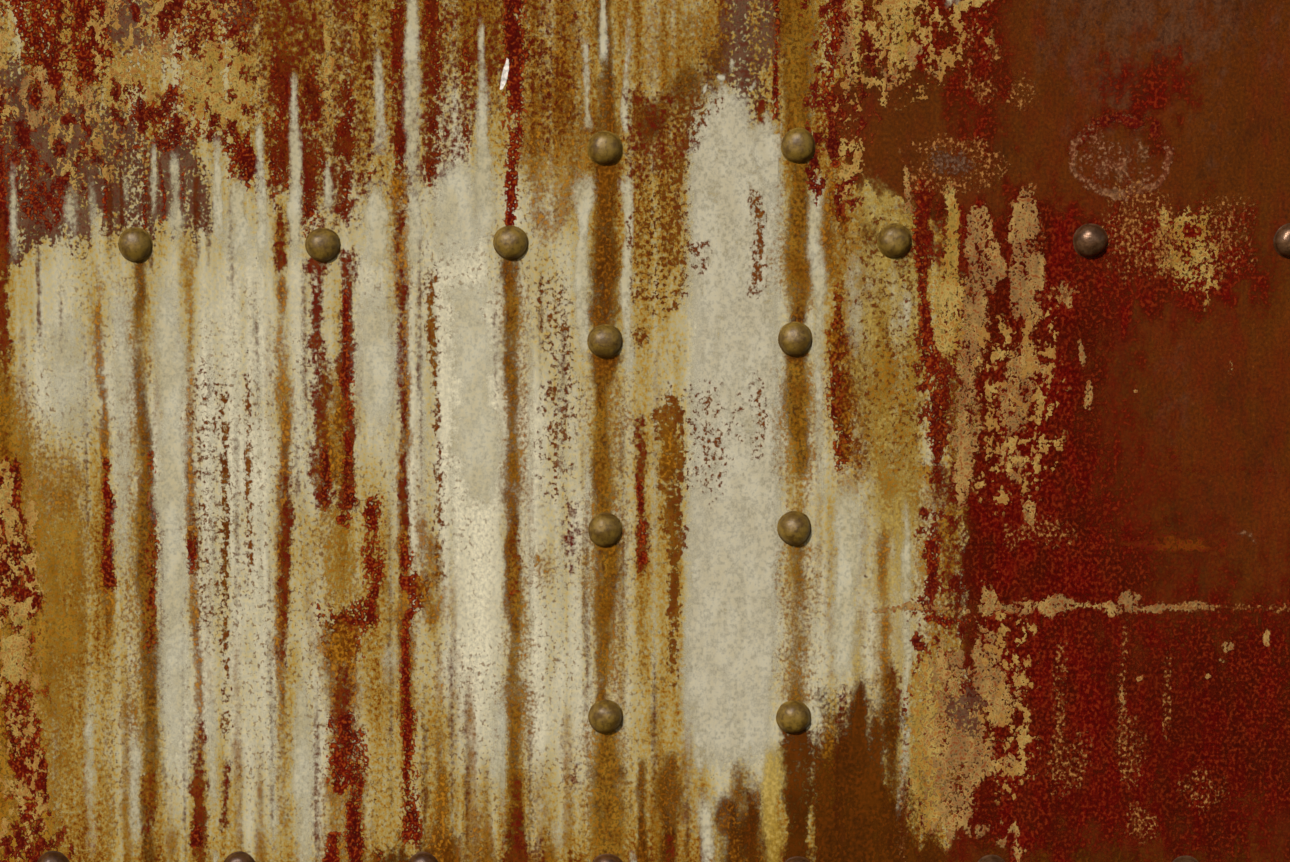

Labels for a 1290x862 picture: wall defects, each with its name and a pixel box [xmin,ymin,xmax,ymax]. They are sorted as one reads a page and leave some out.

rust [0,0,627,862]
rust [494,259,819,862]
peeling [798,0,1093,862]
rust [622,0,1290,862]
peeling [1127,807,1156,838]